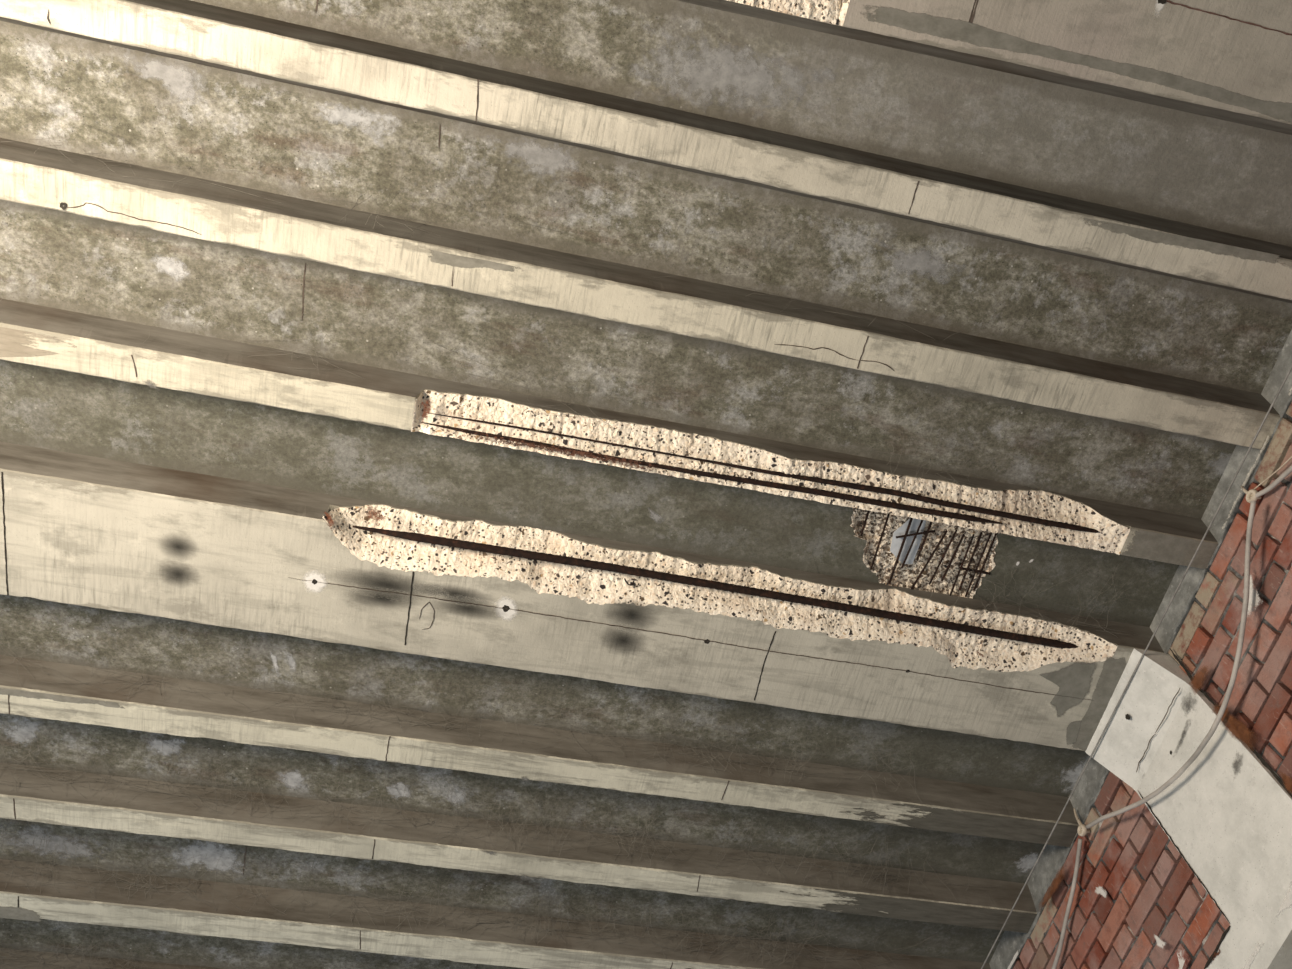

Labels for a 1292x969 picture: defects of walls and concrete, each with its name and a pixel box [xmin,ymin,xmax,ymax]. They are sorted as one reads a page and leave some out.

spalling [727,0,850,26]
crack [66,203,201,235]
crack [775,344,894,371]
spalling [322,390,1131,672]